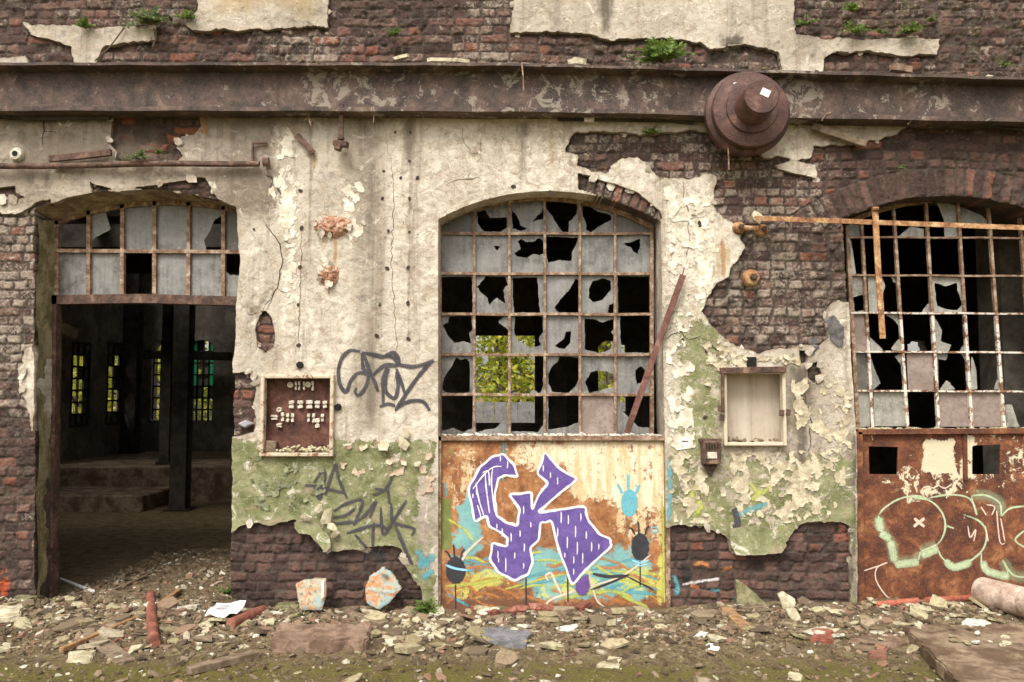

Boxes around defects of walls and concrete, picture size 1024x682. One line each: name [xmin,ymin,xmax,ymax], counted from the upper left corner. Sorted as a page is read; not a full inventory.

spalling [0,0,780,70]
spalling [793,0,1024,77]
spalling [139,173,224,206]
crack [264,222,302,362]
spalling [255,309,275,353]
spalling [565,128,1024,607]
peeling [343,428,435,495]
spalling [230,462,422,608]